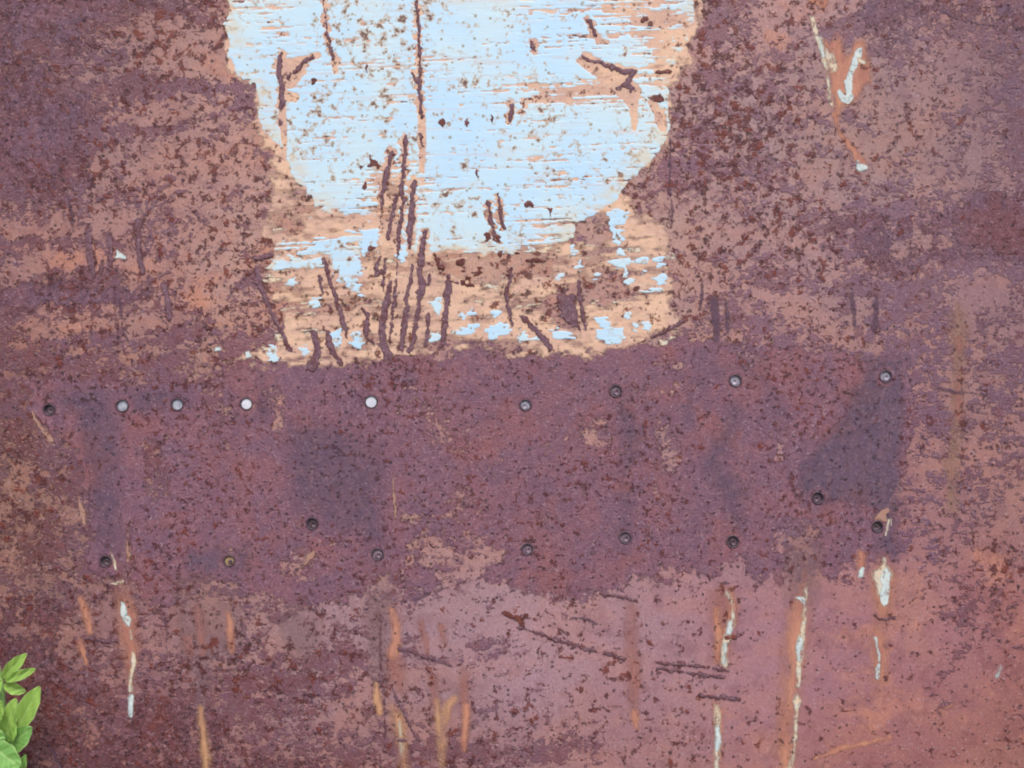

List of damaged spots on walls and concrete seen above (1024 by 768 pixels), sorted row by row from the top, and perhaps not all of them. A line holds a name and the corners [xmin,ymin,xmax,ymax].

rust [853,0,1024,53]
rust [0,0,191,193]
peeling [809,0,871,171]
rust [359,154,382,190]
peeling [223,0,703,370]
rust [0,280,154,316]
rust [556,293,581,331]
rust [823,190,1024,299]
rust [0,334,914,768]